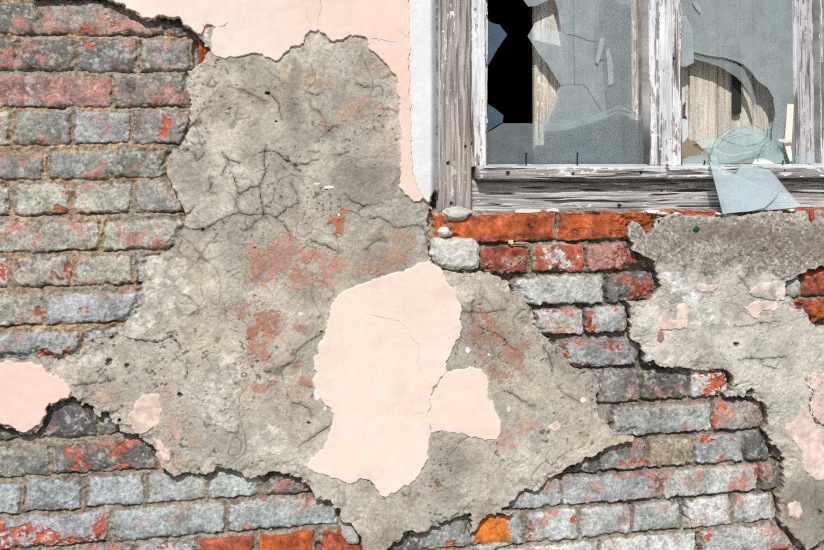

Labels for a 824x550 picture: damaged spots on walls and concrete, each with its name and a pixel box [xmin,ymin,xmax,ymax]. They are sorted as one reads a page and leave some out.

spalling [53,177,68,212]
peeling [0,253,364,550]
crack [186,149,336,251]
peeling [308,0,824,550]